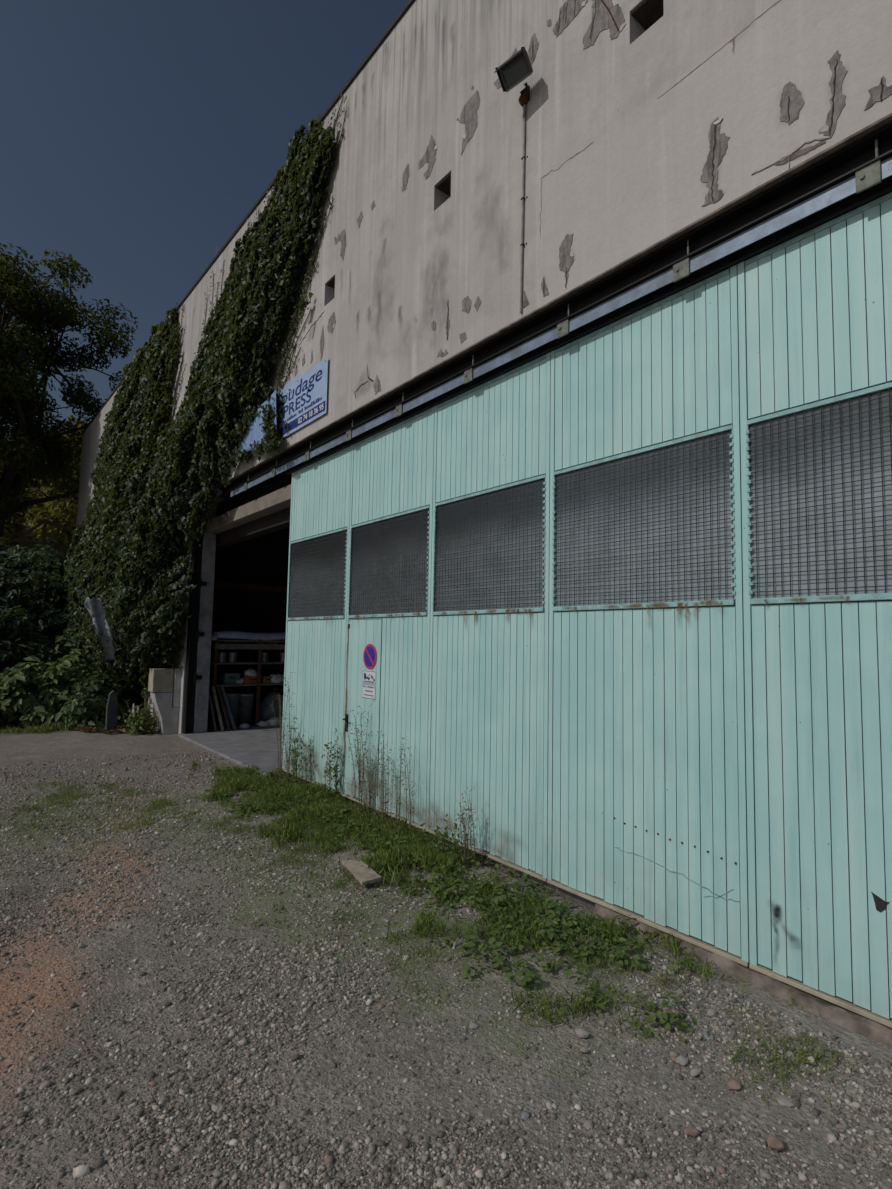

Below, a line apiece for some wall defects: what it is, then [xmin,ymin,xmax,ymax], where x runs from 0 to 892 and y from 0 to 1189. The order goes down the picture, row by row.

peeling [512,32,539,65]
peeling [547,0,626,50]
crack [657,0,781,99]
peeling [457,85,480,155]
peeling [751,50,848,175]
peeling [864,76,892,111]
peeling [401,135,437,191]
peeling [700,117,730,207]
peeling [559,233,574,288]
spalling [871,892,889,912]